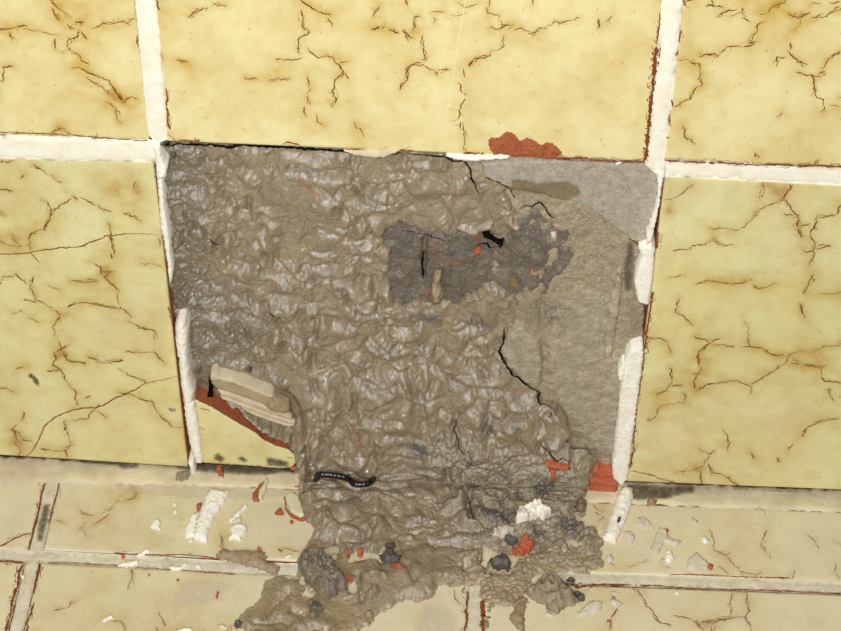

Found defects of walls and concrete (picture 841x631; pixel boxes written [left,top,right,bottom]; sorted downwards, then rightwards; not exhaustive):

crack [484,177,557,220]
crack [0,233,154,255]
peeling [382,132,663,492]
crack [498,328,555,417]
crack [24,375,180,458]
spalling [195,384,296,478]
peeling [493,524,514,538]